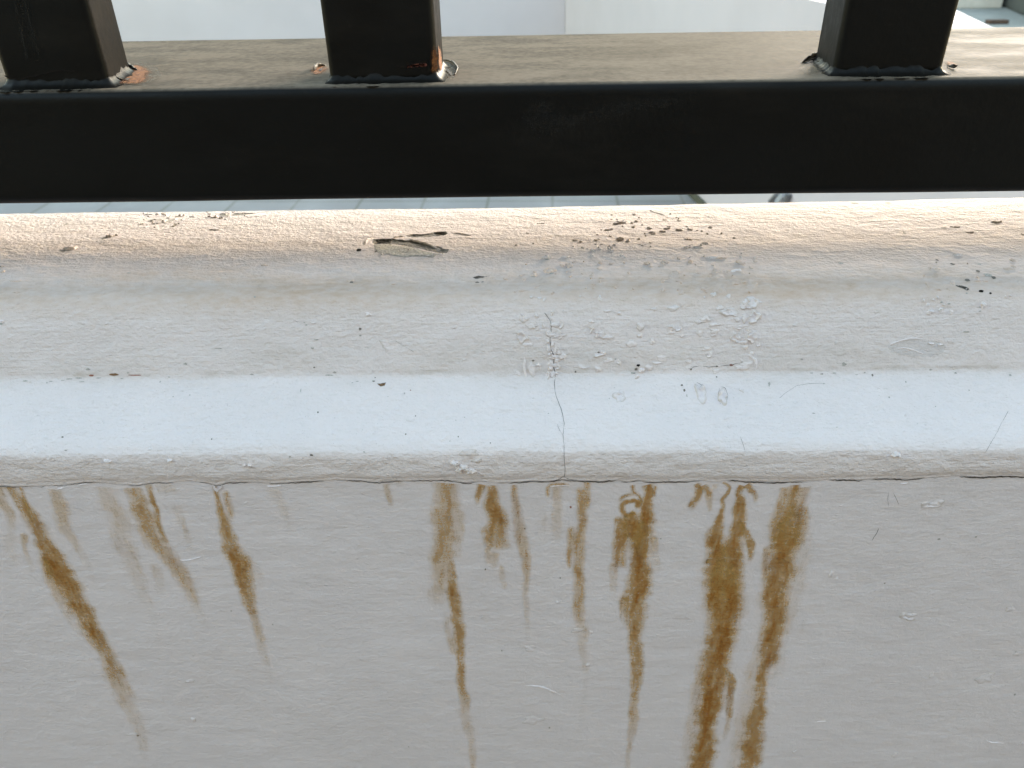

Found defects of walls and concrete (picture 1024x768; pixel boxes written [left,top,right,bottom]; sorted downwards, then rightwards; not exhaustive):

spalling [356,231,471,257]
rust [2,487,124,681]
rust [214,486,257,627]
rust [433,483,468,699]
rust [475,484,528,570]
crack [349,315,694,484]
rust [567,482,589,617]
rust [614,484,656,716]
rust [689,483,756,768]
crack [725,478,802,486]
rust [741,485,807,768]
crack [832,476,1024,506]